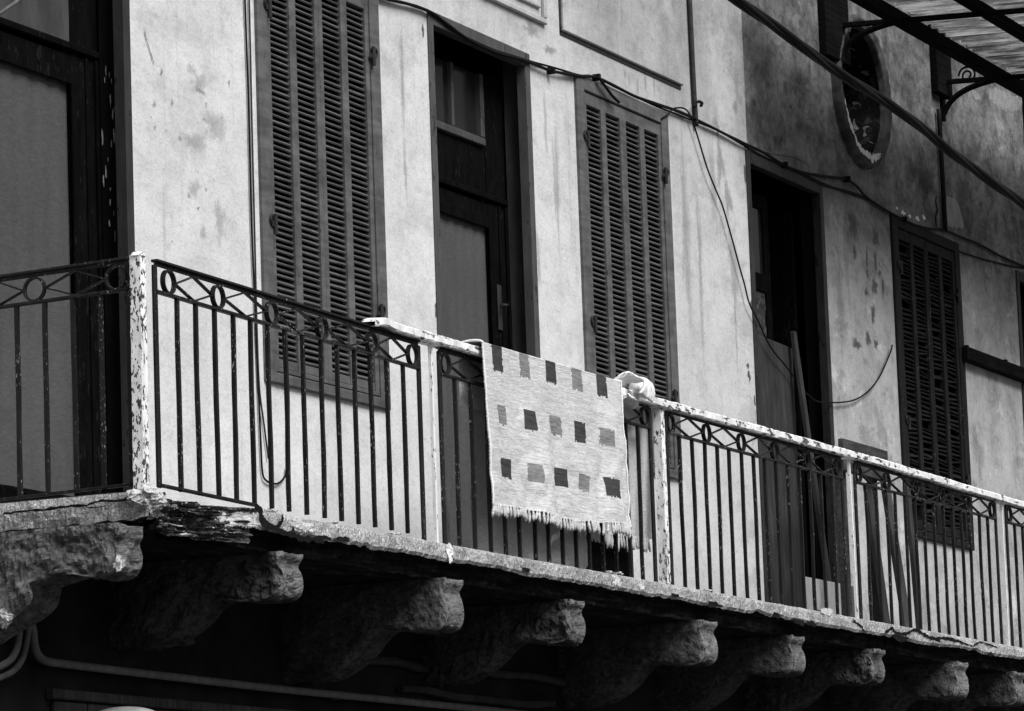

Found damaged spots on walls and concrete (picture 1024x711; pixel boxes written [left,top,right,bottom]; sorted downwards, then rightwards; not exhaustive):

peeling [845,100,881,163]
spalling [157,492,258,543]
crack [853,619,997,649]